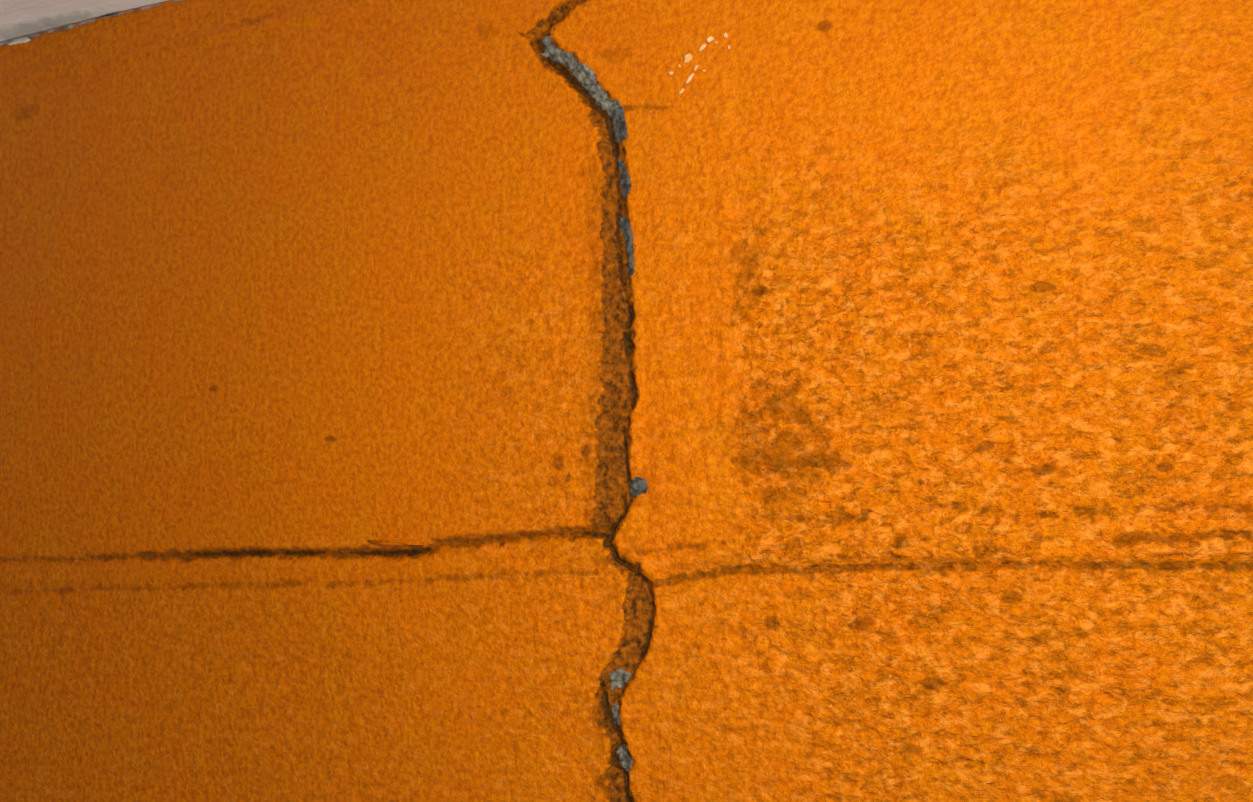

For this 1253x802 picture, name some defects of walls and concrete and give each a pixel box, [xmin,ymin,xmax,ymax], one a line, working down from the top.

corrosion [1031,282,1056,291]
crack [82,0,1032,802]
corrosion [976,440,993,451]
corrosion [1032,464,1055,475]
crack [954,503,1111,520]
corrosion [1115,532,1147,542]
crack [1053,504,1253,571]
corrosion [765,615,779,630]
corrosion [849,617,871,630]
corrosion [921,677,944,688]